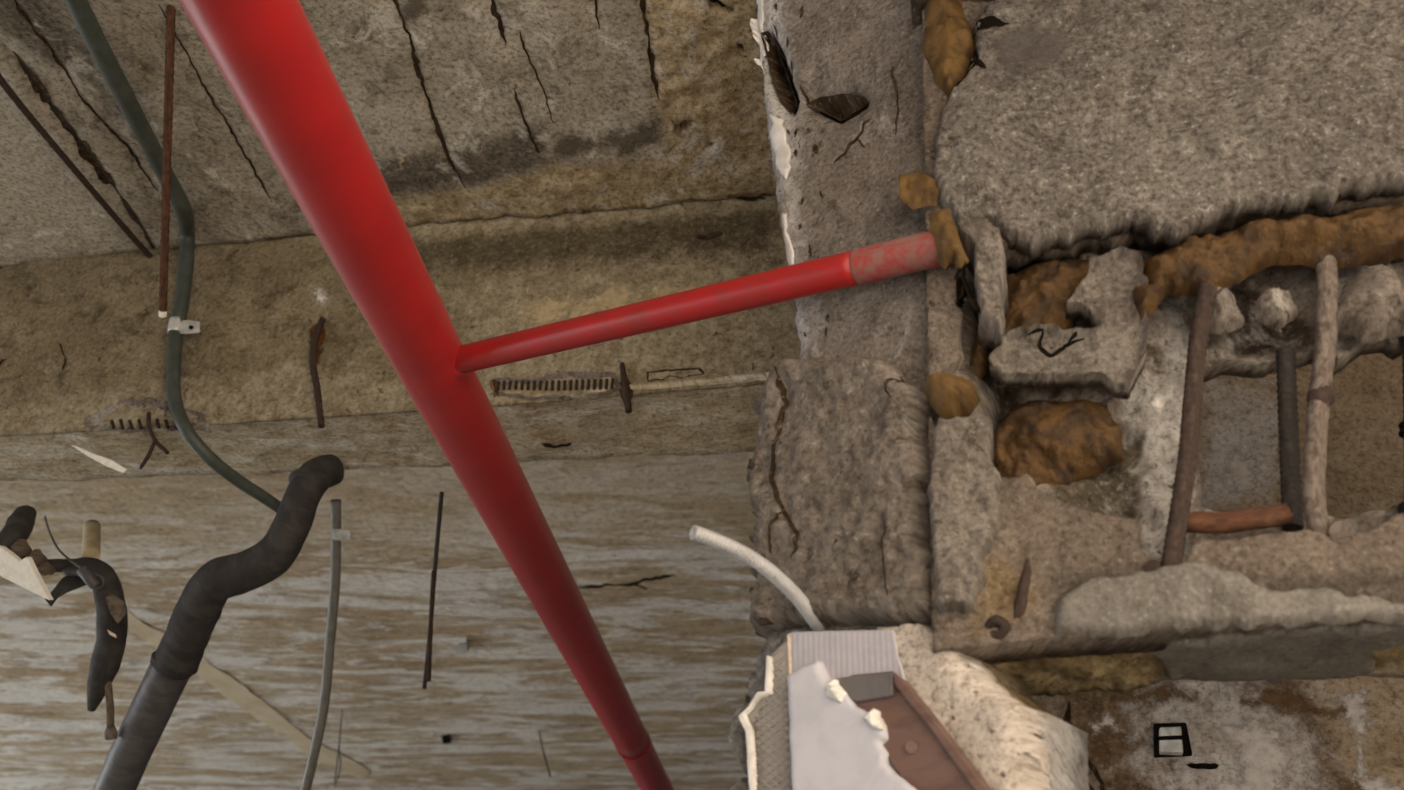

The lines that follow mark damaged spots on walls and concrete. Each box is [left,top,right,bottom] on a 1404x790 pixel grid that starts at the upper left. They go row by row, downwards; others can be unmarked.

crack [13,0,158,249]
crack [393,0,465,188]
crack [491,0,554,153]
crack [640,0,659,99]
peeling [744,0,869,180]
crack [773,2,899,257]
peeling [781,213,794,265]
spalling [941,273,967,308]
spalling [993,255,1404,567]
crack [579,575,675,589]
water stain [1092,684,1198,762]
water stain [1214,688,1402,790]